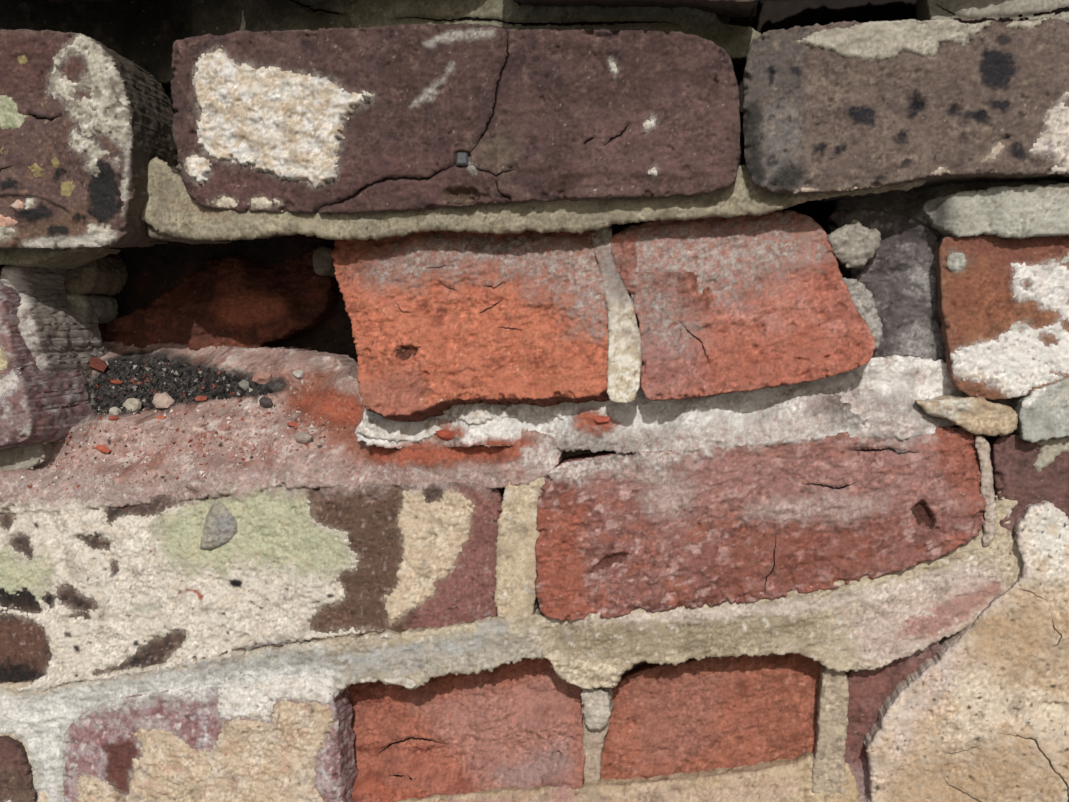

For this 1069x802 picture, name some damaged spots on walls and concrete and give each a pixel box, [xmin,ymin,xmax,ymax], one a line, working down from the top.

crack [291,0,345,15]
crack [317,17,678,211]
peeling [1033,436,1069,473]
spalling [911,500,937,532]
peeling [0,480,476,693]
crack [939,733,1069,802]